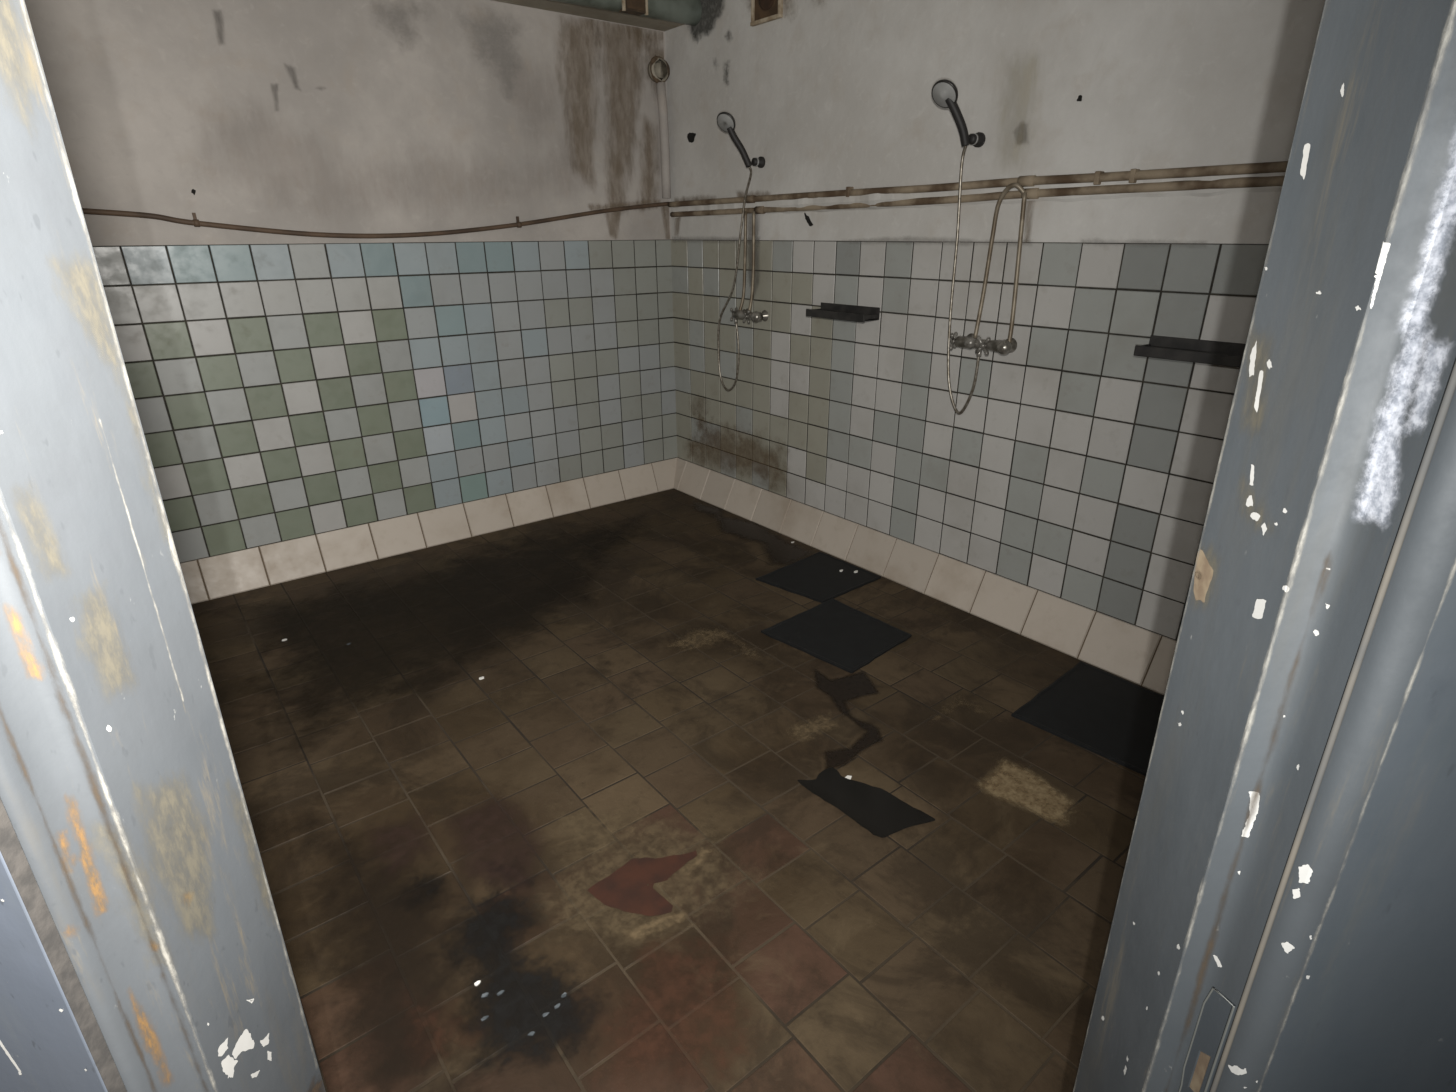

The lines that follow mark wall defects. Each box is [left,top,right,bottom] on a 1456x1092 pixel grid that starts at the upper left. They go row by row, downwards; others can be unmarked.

peeling [1242,791,1260,838]
peeling [1292,864,1313,899]
peeling [218,1029,272,1078]
peeling [1228,1065,1258,1088]